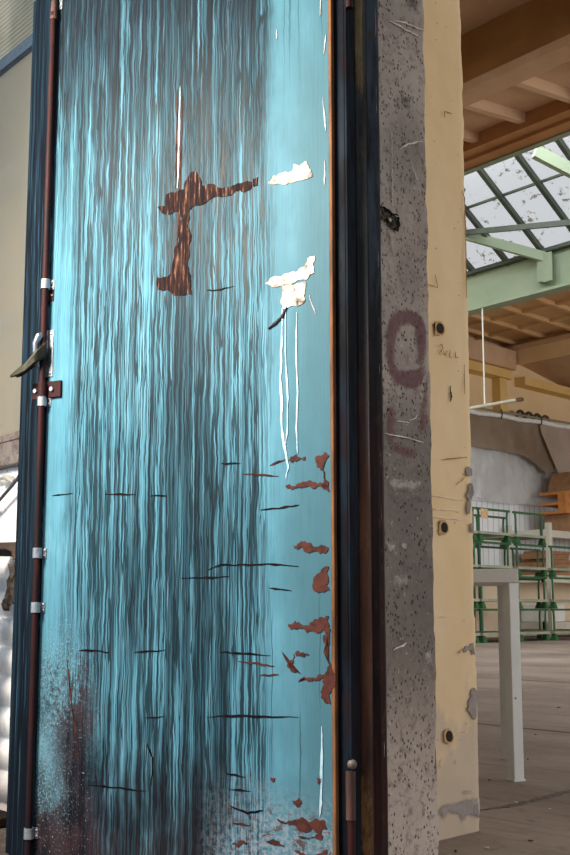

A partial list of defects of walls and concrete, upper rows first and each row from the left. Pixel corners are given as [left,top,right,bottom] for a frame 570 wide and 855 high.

peeling [156,161,313,296]
peeling [266,256,316,314]
corrosion [285,452,329,492]
corrosion [294,541,328,554]
corrosion [312,566,330,593]
corrosion [282,616,336,704]
spalling [467,688,478,720]
peeling [438,791,479,820]
crack [480,790,570,811]
corrosion [277,798,327,855]